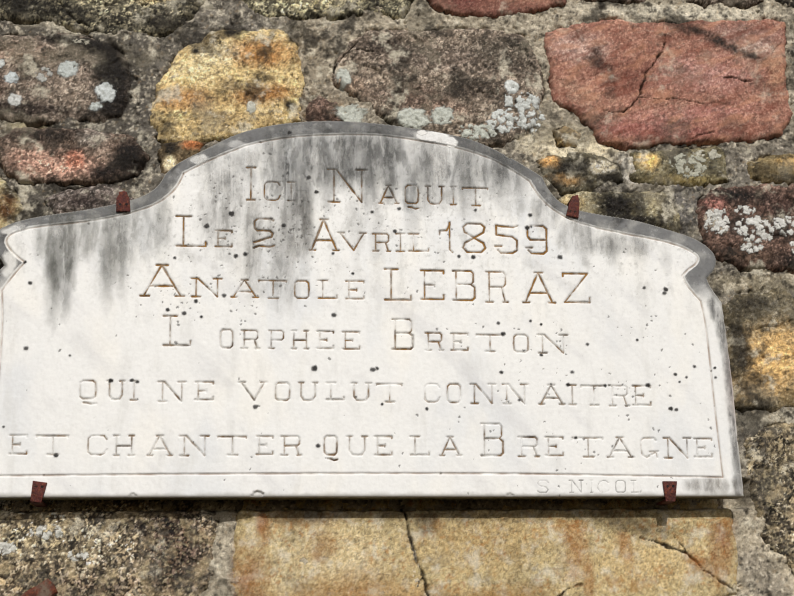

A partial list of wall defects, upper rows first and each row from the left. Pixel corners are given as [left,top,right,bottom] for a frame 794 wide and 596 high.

crack [603,36,665,113]
water stain [0,232,8,258]
water stain [11,121,418,288]
water stain [452,136,716,288]
crack [401,510,429,596]
crack [654,537,732,589]